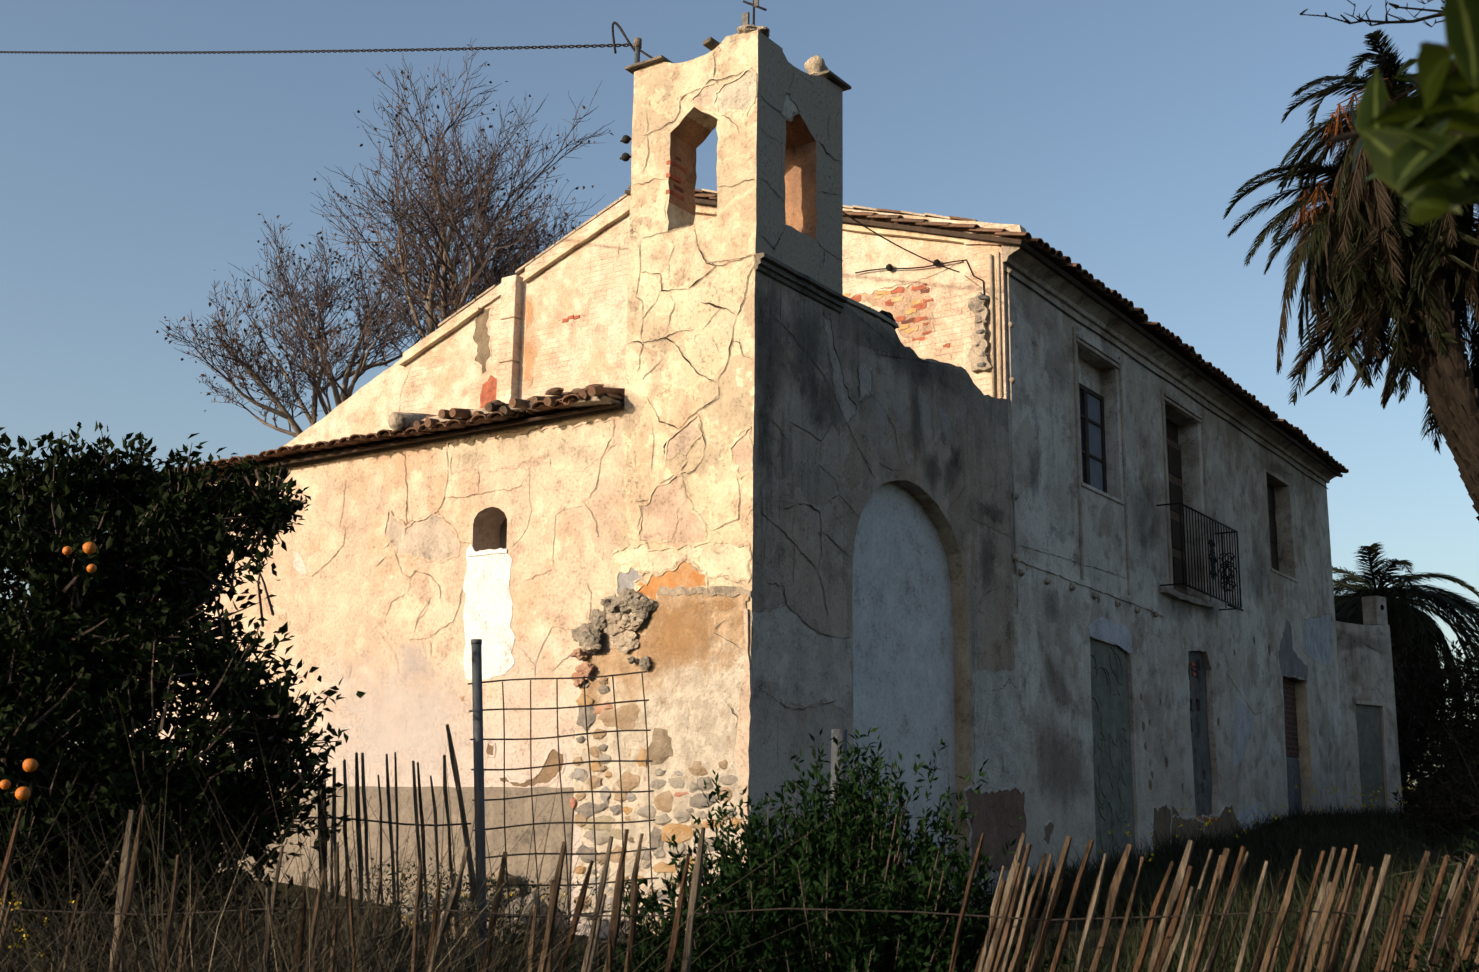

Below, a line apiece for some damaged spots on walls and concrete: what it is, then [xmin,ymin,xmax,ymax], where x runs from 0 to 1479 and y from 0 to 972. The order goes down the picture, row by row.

crack [523,59,900,743]
spalling [843,282,950,348]
spalling [968,292,993,373]
crack [308,479,345,577]
crack [376,450,524,668]
spalling [485,414,852,924]